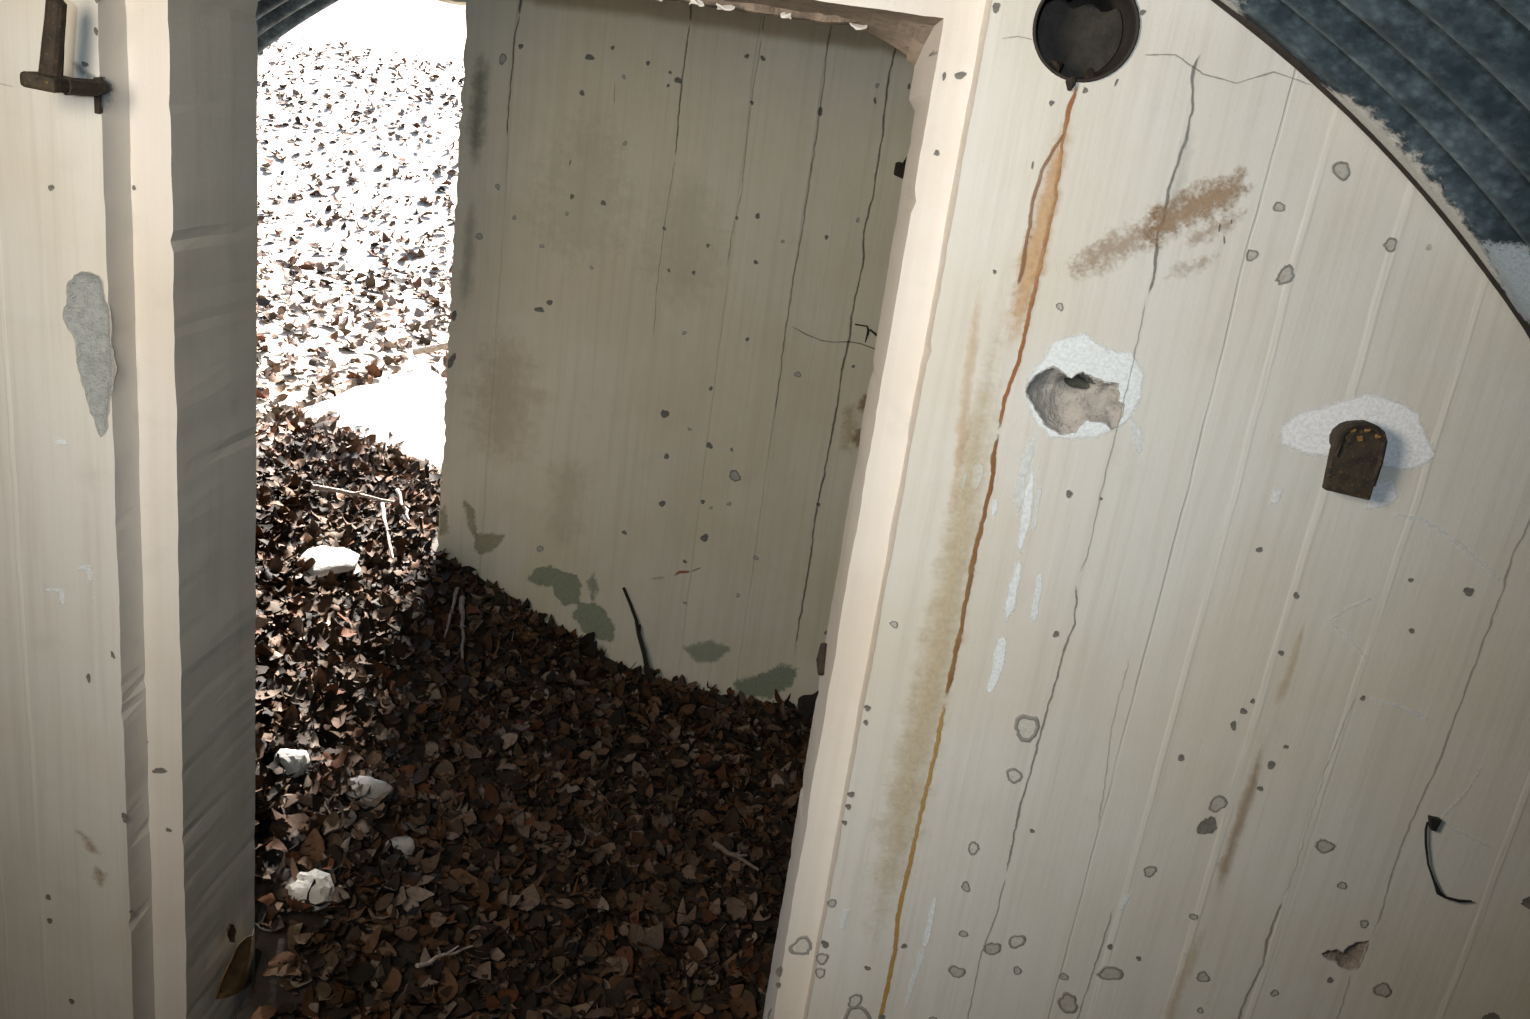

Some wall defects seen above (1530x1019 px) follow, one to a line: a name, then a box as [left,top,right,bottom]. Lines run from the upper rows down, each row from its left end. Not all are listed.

crack [1150,57,1199,289]
corrosion [1147,174,1246,240]
peeling [63,271,117,437]
crack [795,48,934,640]
corrosion [878,60,1095,1019]
spalling [1025,365,1125,435]
corrosion [1329,421,1388,486]
crack [1007,591,1077,865]